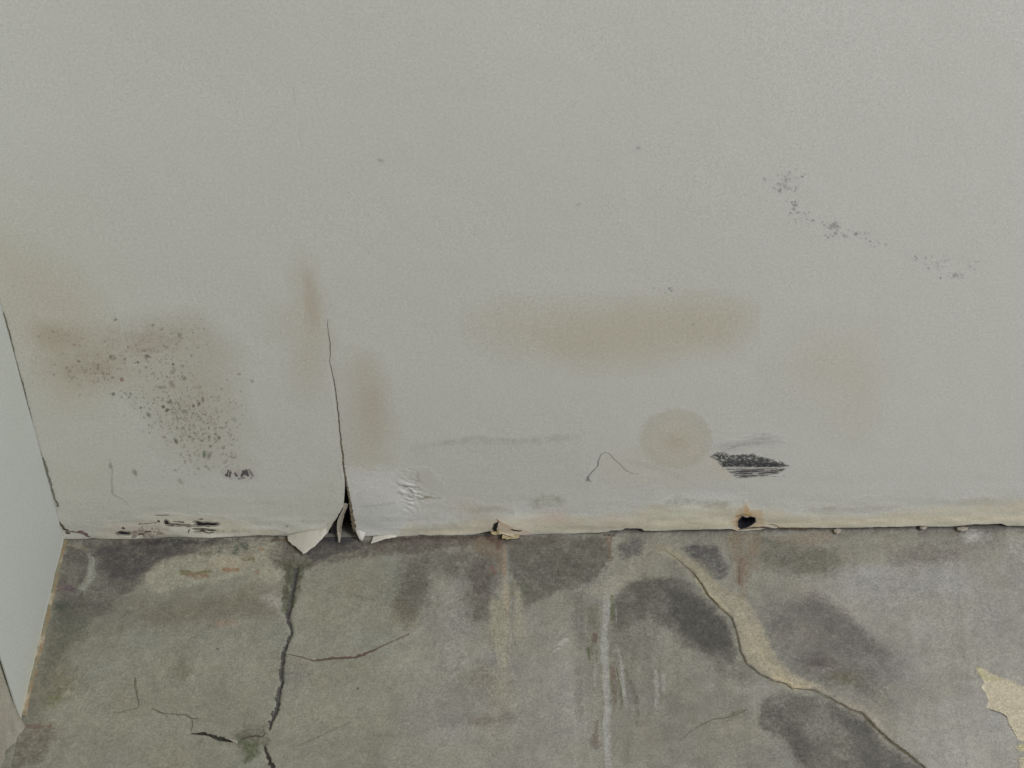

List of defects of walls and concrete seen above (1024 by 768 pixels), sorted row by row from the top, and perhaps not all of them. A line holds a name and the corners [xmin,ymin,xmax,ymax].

mould [763,168,887,248]
crack [3,313,91,538]
water stain [0,216,586,488]
crack [327,319,356,543]
water stain [459,287,761,378]
crack [118,564,409,768]
peeling [356,530,397,543]
water stain [37,406,1024,768]
peeling [973,666,1024,768]